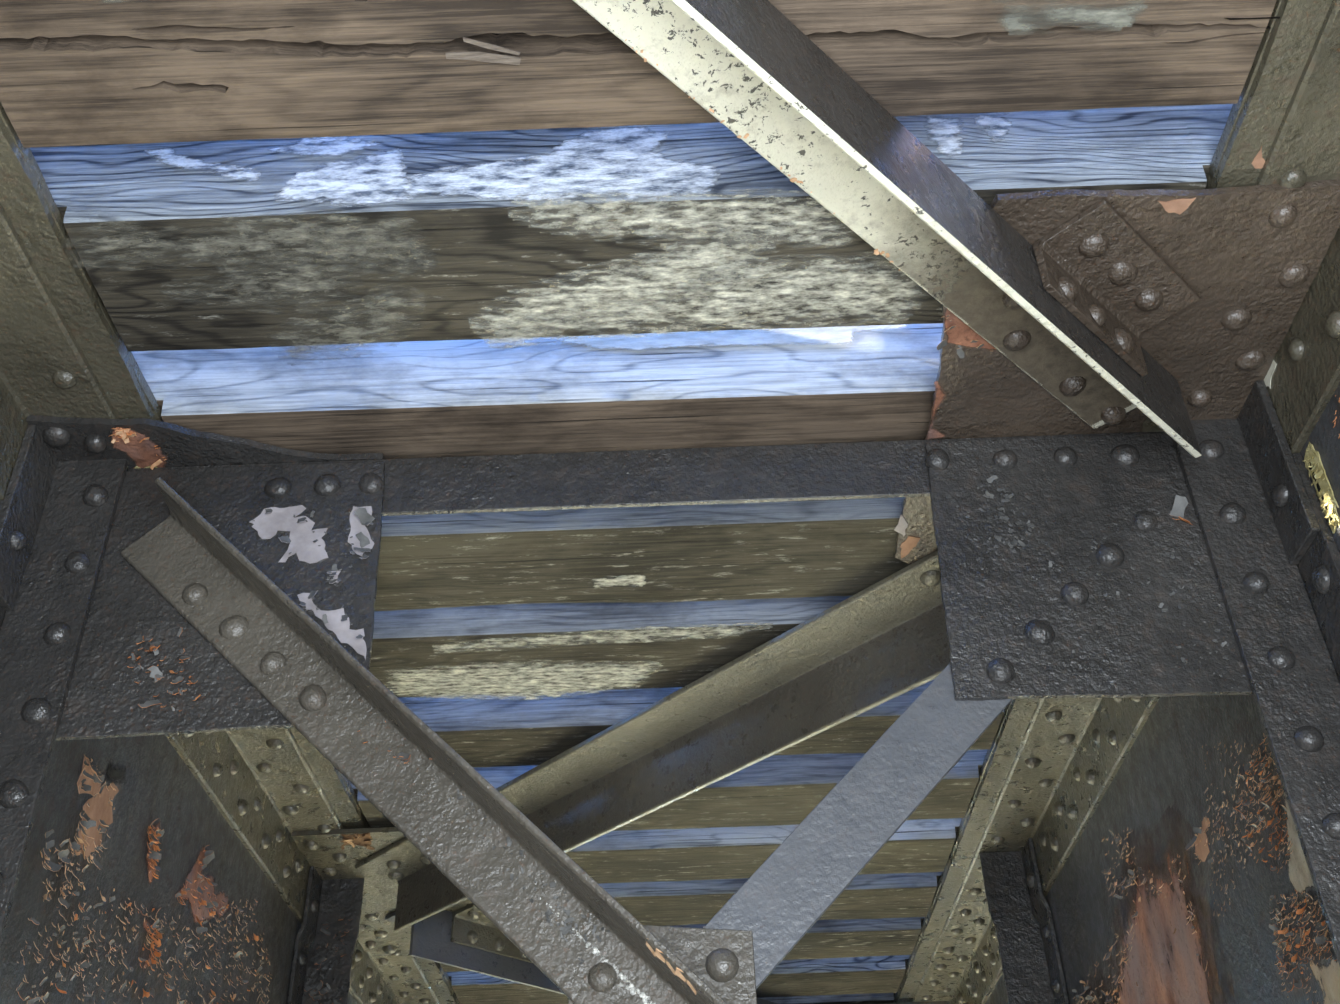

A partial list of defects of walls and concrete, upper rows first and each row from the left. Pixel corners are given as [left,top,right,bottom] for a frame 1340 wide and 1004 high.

crack [1225,17,1280,29]
leakage [926,114,1012,156]
leakage [74,127,1132,426]
rust [112,427,165,468]
spalling [347,506,375,559]
spalling [250,505,367,661]
rust [146,818,165,884]
rust [142,918,164,971]
rust [175,845,229,926]
rust [1072,829,1232,1004]